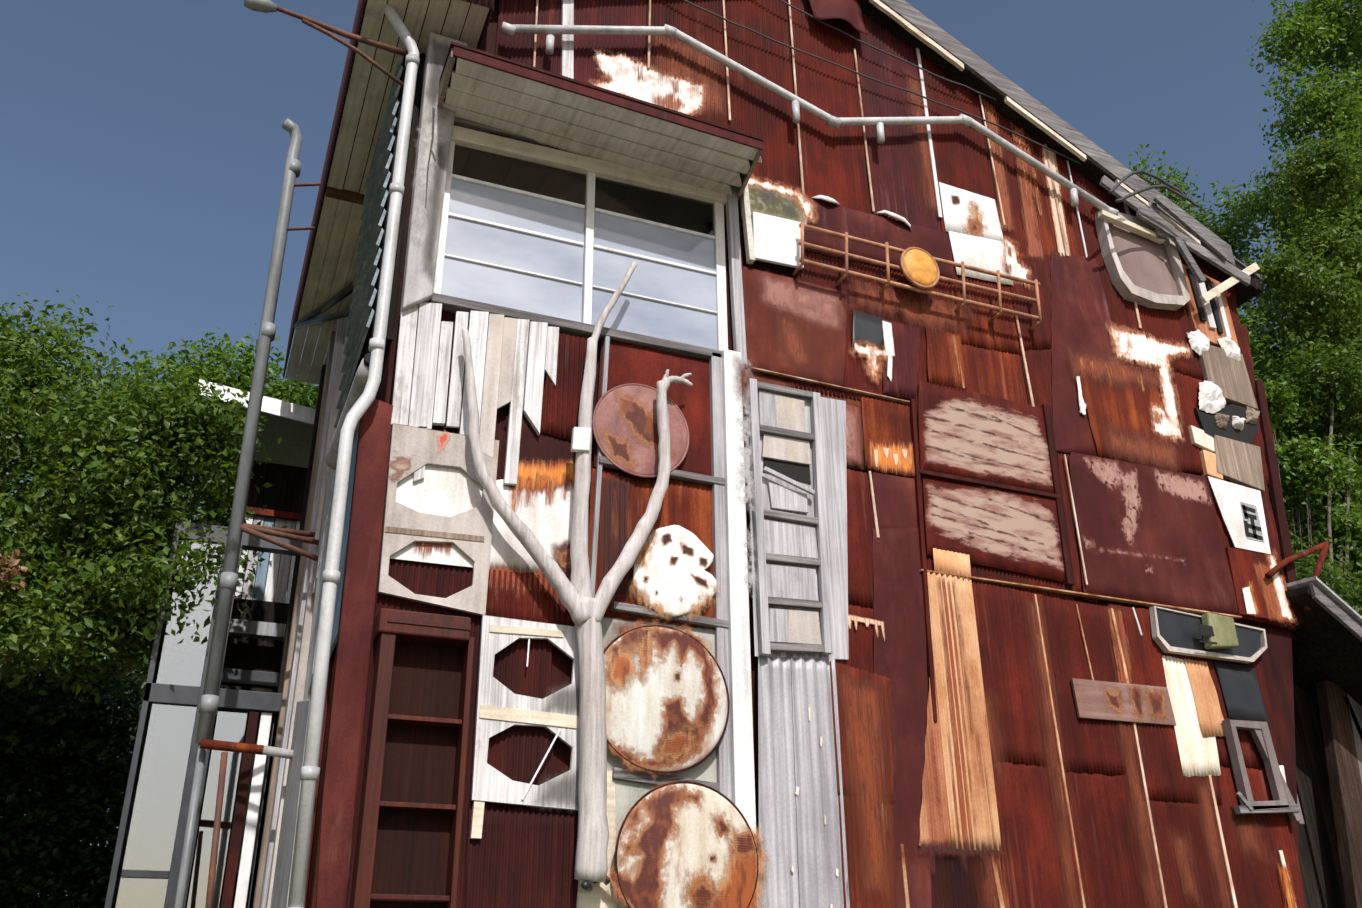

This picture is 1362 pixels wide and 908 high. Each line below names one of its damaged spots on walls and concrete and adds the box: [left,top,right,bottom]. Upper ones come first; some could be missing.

peeling [591,49,703,114]
peeling [854,321,895,381]
spalling [1108,326,1260,444]
rust [508,460,575,512]
rust [869,440,915,474]
peeling [923,398,1064,571]
rust [599,391,719,908]
rust [836,670,893,905]
rust [920,578,1010,908]
rust [684,816,768,908]